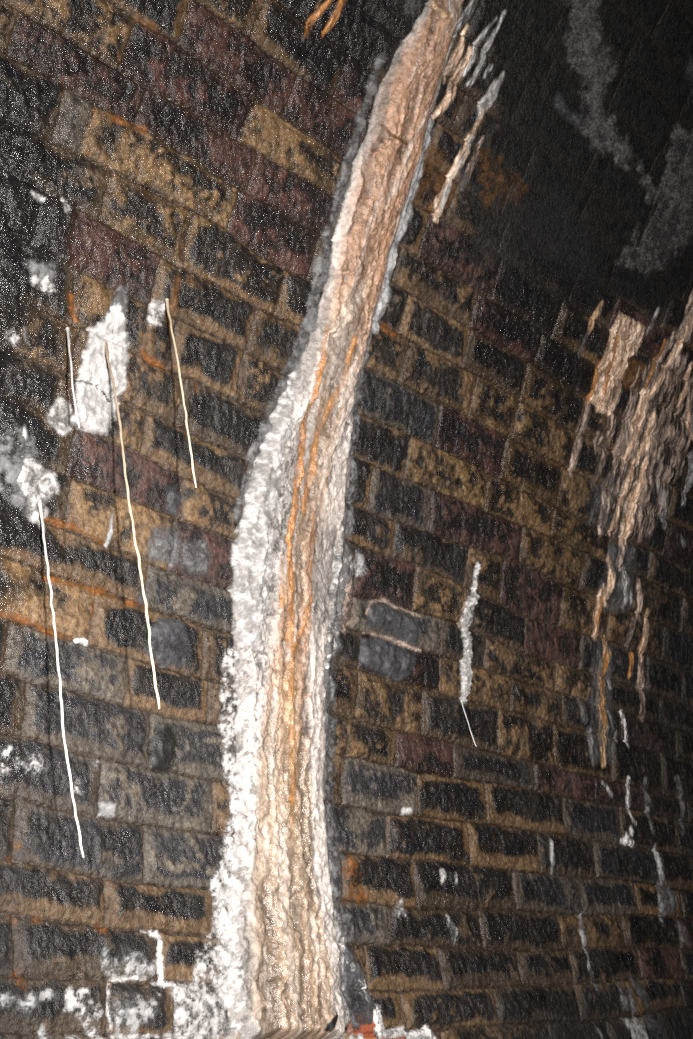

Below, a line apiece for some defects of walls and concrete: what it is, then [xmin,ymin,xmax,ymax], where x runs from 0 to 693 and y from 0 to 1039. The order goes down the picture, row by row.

water stain [304,0,343,37]
water stain [432,107,484,223]
water stain [104,513,114,548]
water stain [336,551,366,632]
water stain [456,561,481,704]
water stain [0,930,262,1039]
spalling [339,1011,408,1039]